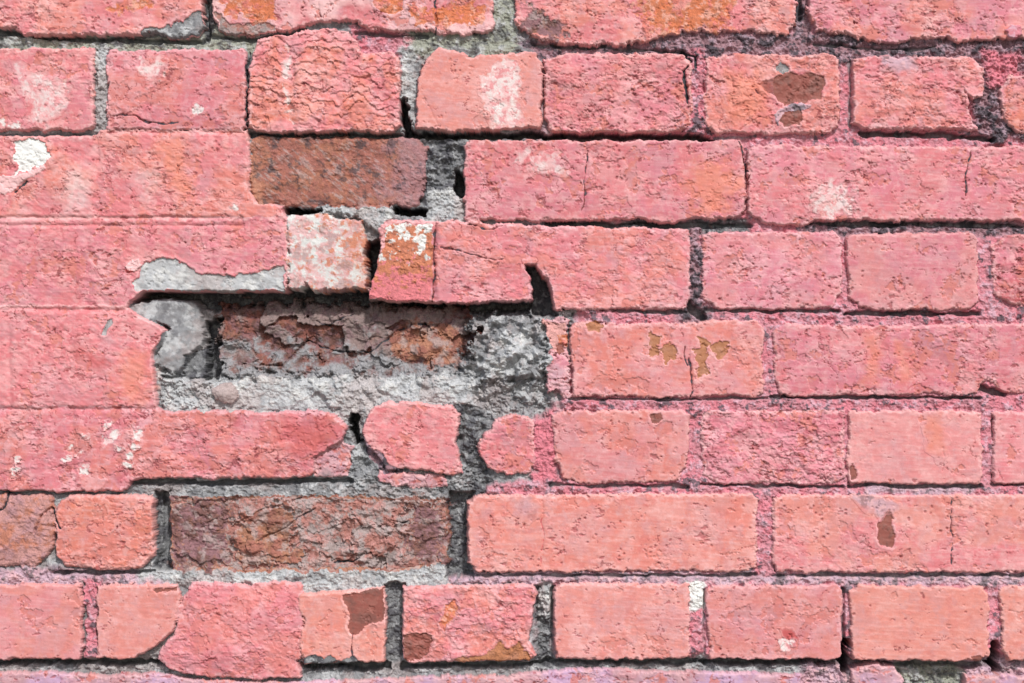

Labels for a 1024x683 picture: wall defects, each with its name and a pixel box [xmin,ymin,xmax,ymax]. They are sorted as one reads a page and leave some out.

peeling [773,62,825,127]
crack [732,78,762,205]
crack [580,152,588,211]
spalling [128,43,485,413]
peeling [648,331,678,365]
peeling [692,336,729,378]
spalling [154,484,460,593]
peeling [877,514,895,548]
peeling [343,587,386,635]